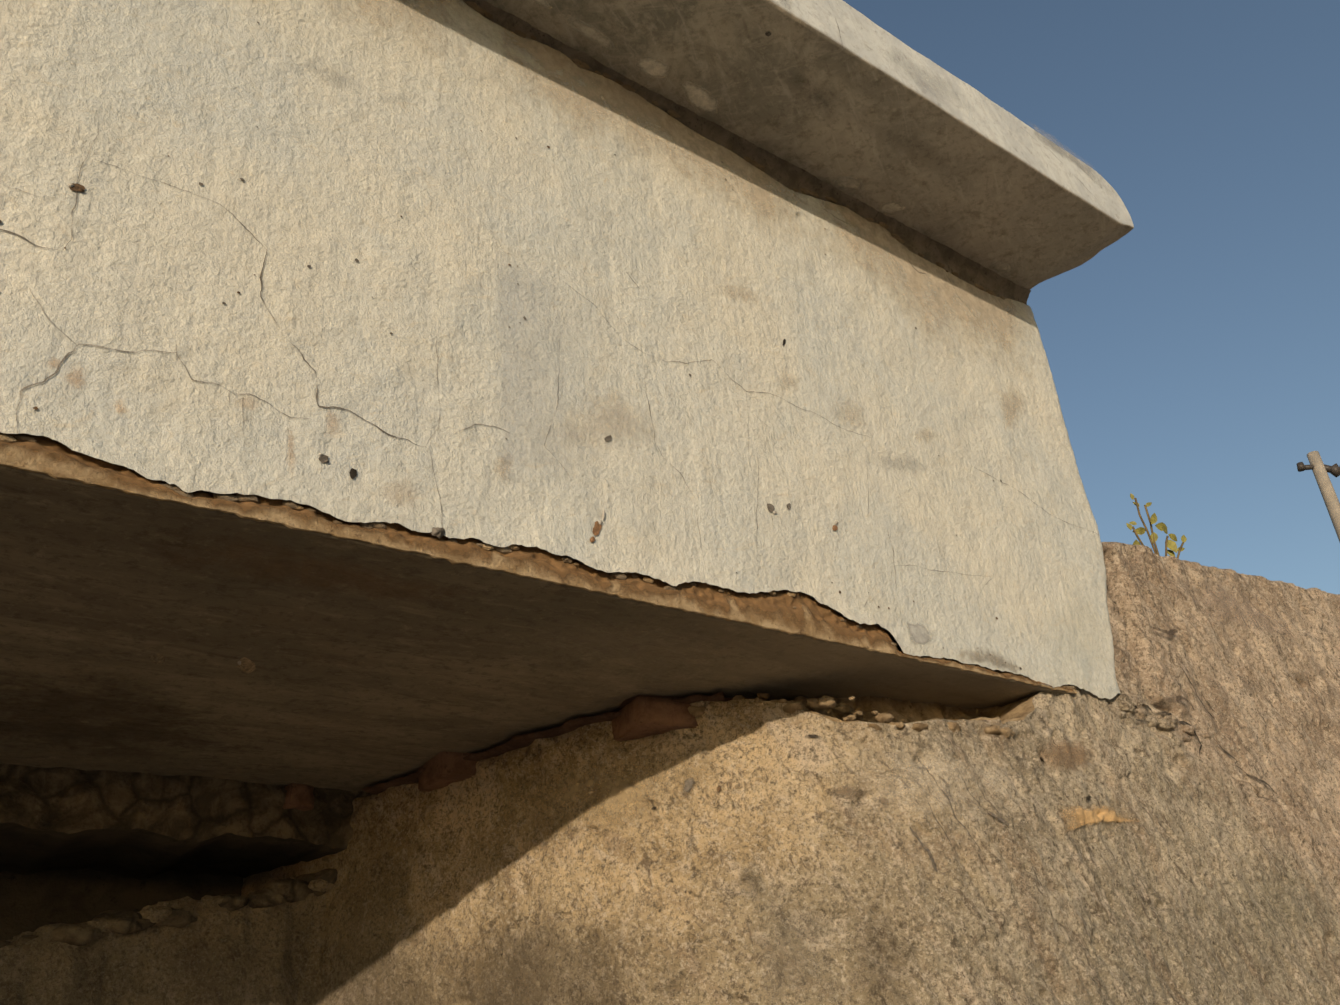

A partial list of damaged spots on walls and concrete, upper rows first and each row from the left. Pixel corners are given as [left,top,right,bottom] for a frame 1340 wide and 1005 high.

crack [0,162,84,250]
crack [233,215,267,301]
crack [16,344,205,426]
crack [250,353,424,447]
spalling [0,432,1077,738]